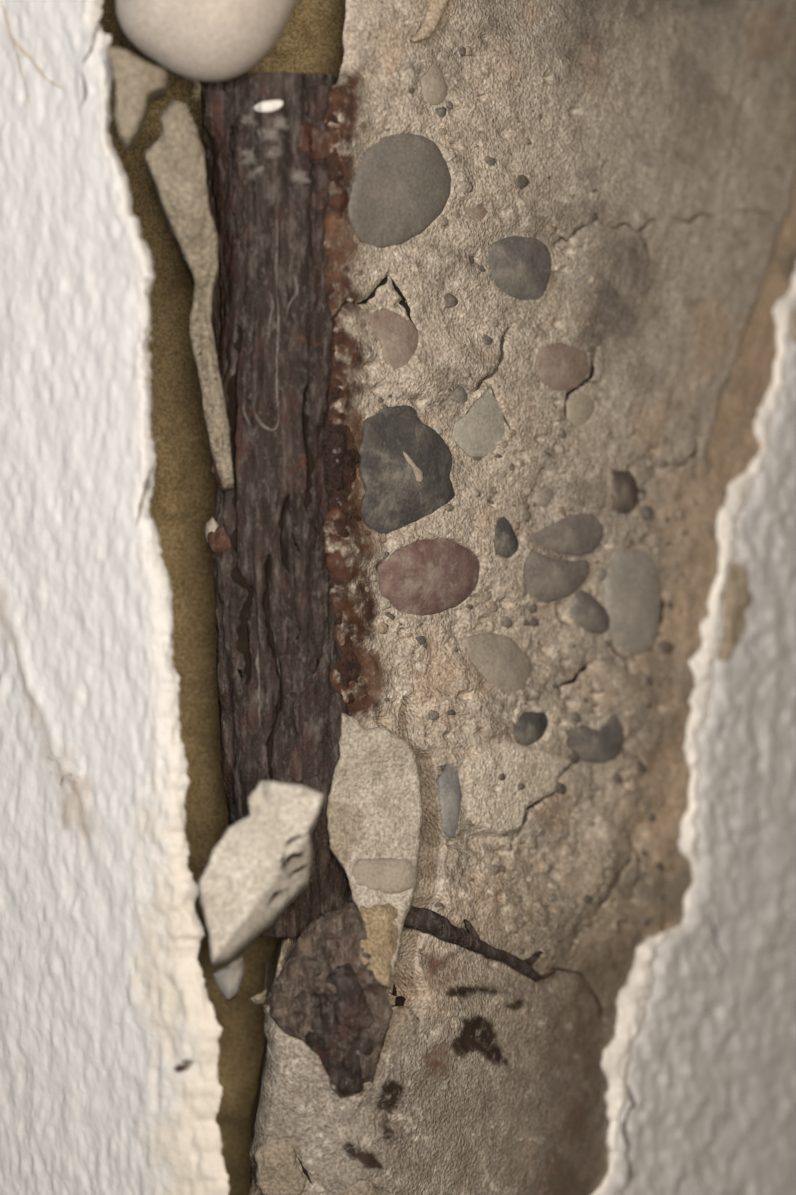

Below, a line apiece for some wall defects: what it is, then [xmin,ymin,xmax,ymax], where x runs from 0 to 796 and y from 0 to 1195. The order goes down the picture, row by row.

spalling [76,0,234,1195]
corrosion [281,75,383,783]
spalling [195,0,796,1195]
crack [514,765,570,838]
crack [552,842,640,1021]
crack [553,210,773,258]